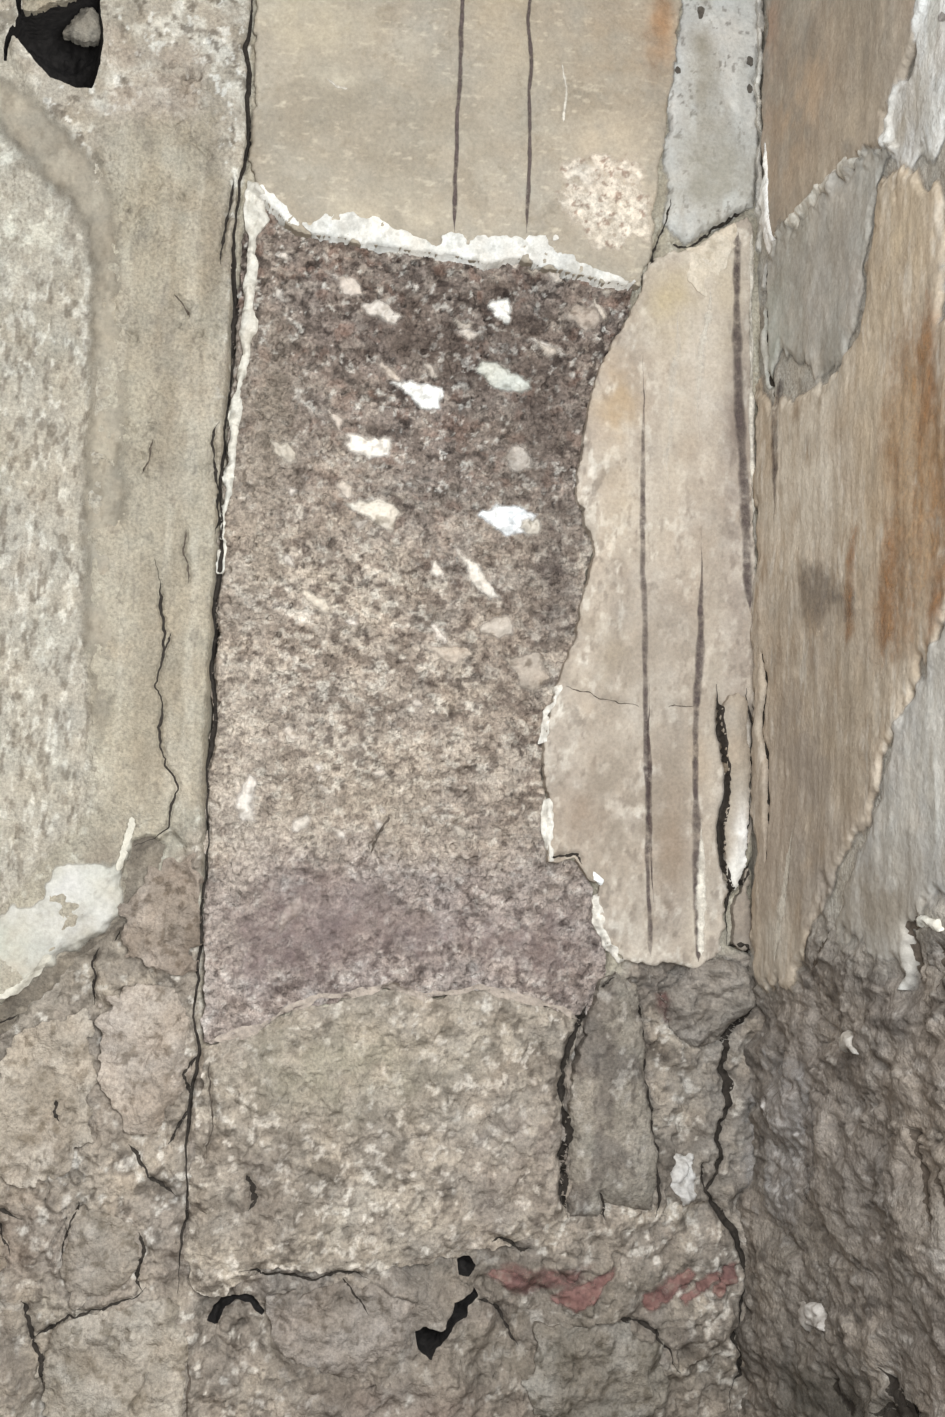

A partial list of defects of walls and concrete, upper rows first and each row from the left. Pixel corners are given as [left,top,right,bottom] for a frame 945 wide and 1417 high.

crack [21,0,253,1386]
crack [567,654,770,953]
flaking render [0,817,165,1035]
crack [557,977,662,1219]
crack [0,1208,23,1253]
crack [184,1359,192,1417]
crack [240,1268,368,1314]
crack [620,1317,680,1373]
crack [700,1009,752,1408]